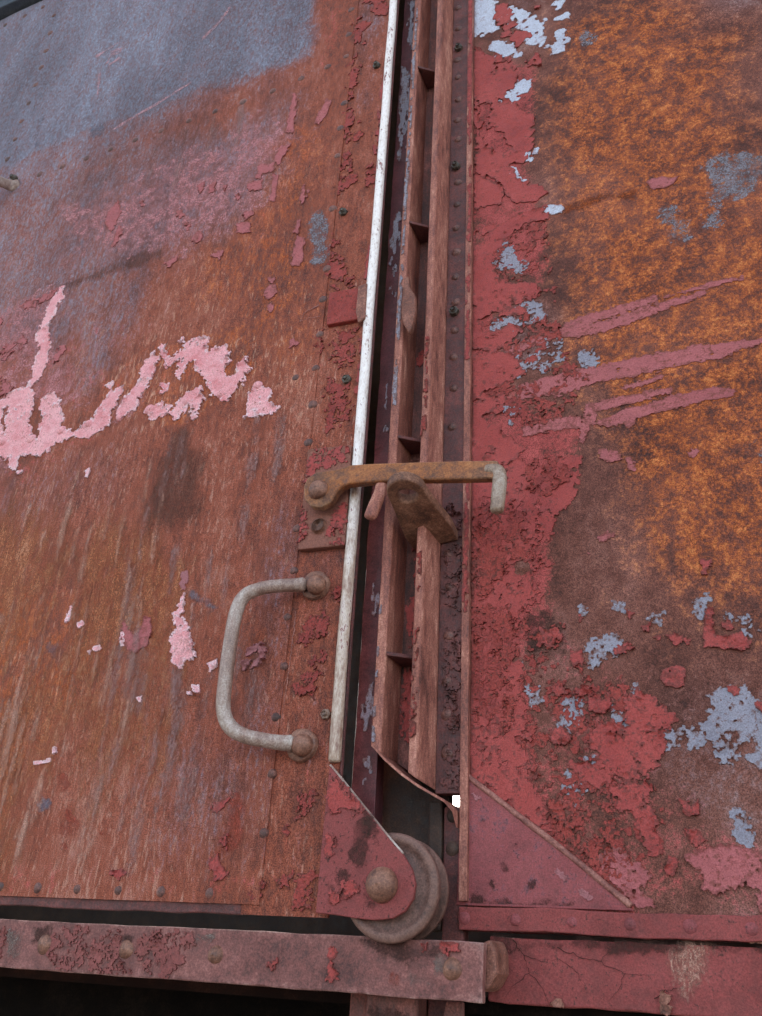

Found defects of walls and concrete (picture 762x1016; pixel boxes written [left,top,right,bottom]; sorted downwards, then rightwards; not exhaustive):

peeling [333,0,389,195]
peeling [388,0,418,340]
peeling [323,221,370,291]
peeling [0,285,281,475]
peeling [384,359,398,409]
peeling [462,0,762,913]
spalling [64,606,85,629]
peeling [168,570,197,670]
spalling [33,746,58,765]
rust [0,506,184,869]
peeling [360,669,378,743]
peeling [46,924,197,979]